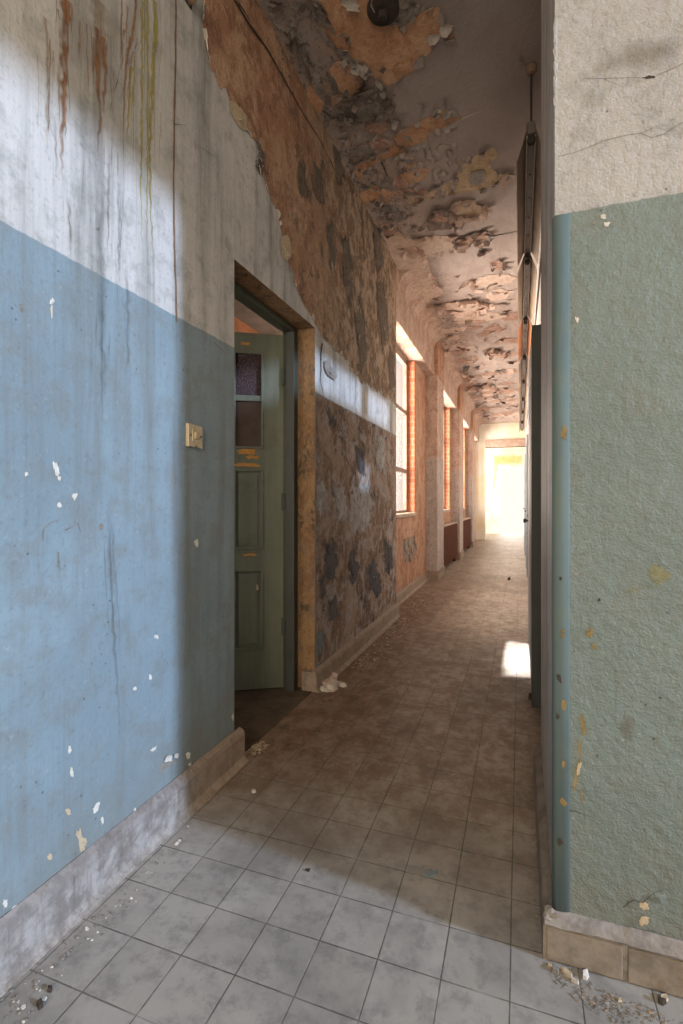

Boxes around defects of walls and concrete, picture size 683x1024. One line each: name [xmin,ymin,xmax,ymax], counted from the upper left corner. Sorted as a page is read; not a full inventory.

corrosion [48,0,138,147]
crack [595,63,683,89]
leakage [127,0,162,228]
crack [558,122,683,157]
flaking render [202,0,519,420]
peeling [315,394,418,667]
flaking render [150,746,191,774]
peeling [75,828,87,852]
peeling [639,902,650,927]